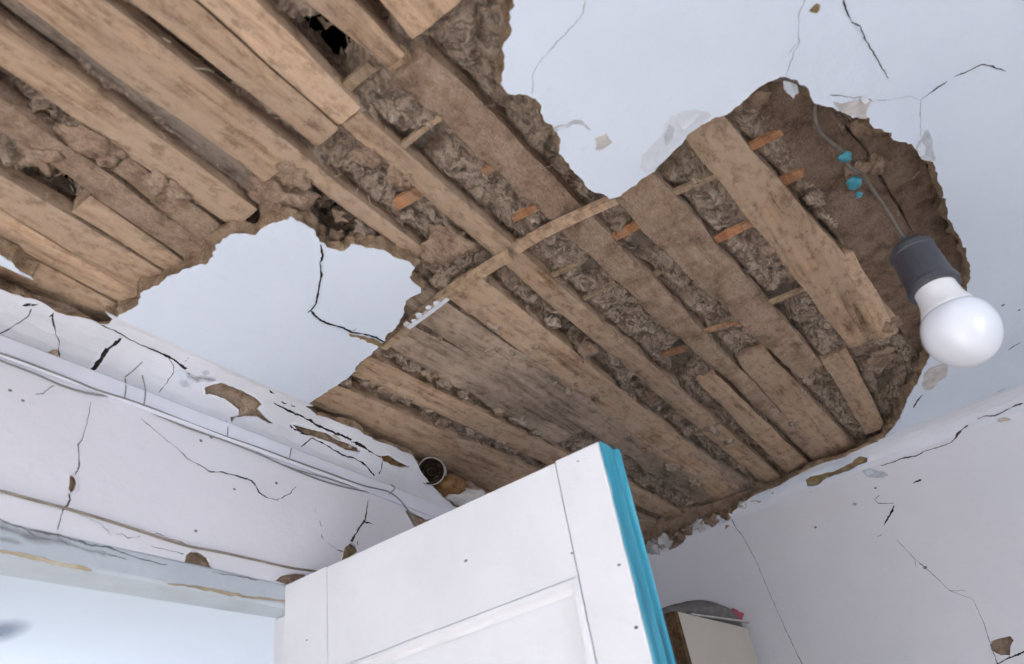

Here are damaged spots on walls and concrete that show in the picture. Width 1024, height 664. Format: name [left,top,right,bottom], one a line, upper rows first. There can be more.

crack [832,0,1005,137]
peeling [833,95,871,119]
peeling [640,109,712,173]
peeling [916,130,935,161]
crack [307,244,386,347]
crack [0,303,60,357]
crack [88,325,189,392]
flaking render [176,368,274,425]
crack [880,389,1023,483]
crack [0,403,185,565]
spalling [641,432,888,555]
flaking render [988,634,1016,657]